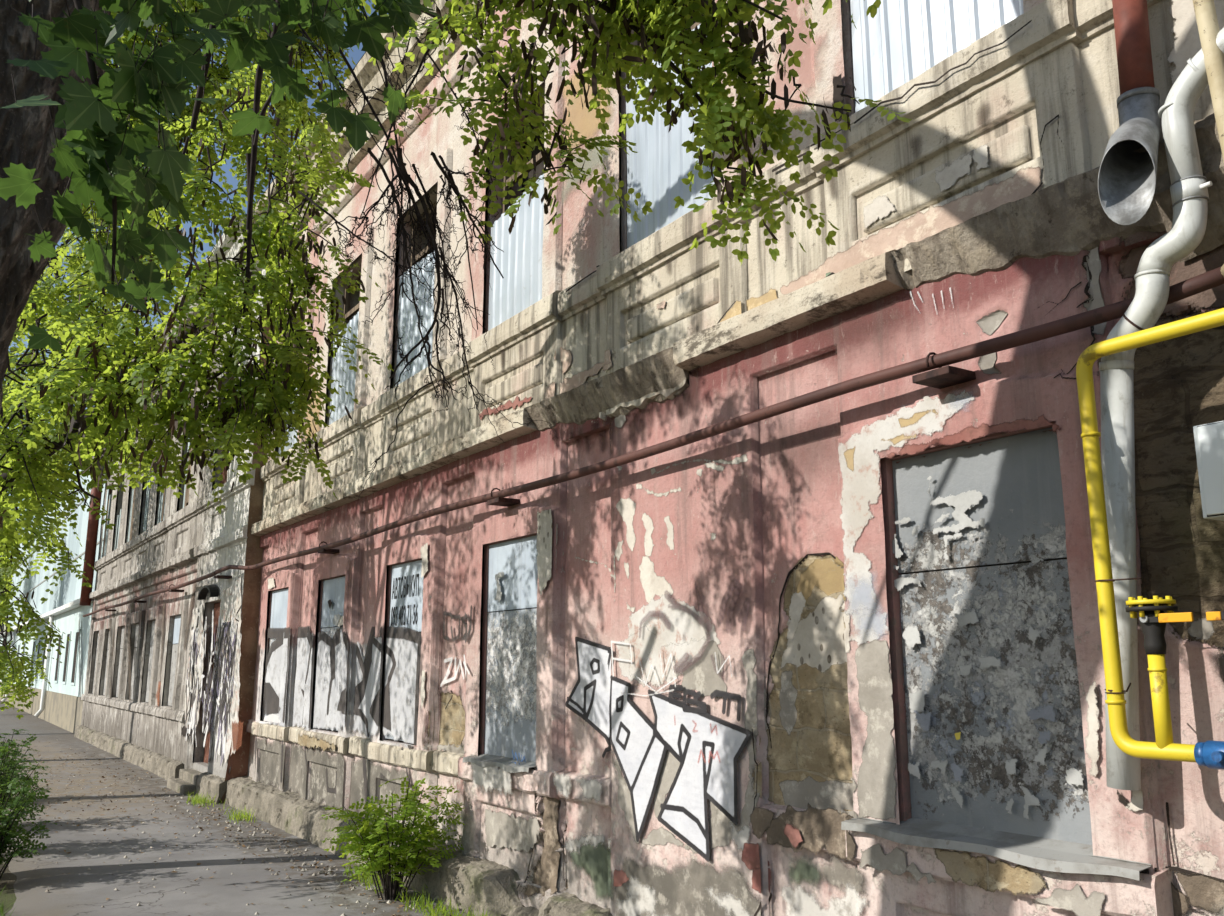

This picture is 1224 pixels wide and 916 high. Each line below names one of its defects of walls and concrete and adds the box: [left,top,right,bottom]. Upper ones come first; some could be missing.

damp [978,106,986,125]
flaking render [719,166,1041,323]
flaking render [976,310,1007,335]
peeling [479,347,612,420]
damp [553,416,612,452]
damp [627,369,698,444]
flaking render [978,352,1002,374]
peeling [420,543,428,578]
peeling [536,508,564,595]
flaking render [613,389,1061,895]
flaking render [420,670,465,754]
flaking render [520,795,568,900]